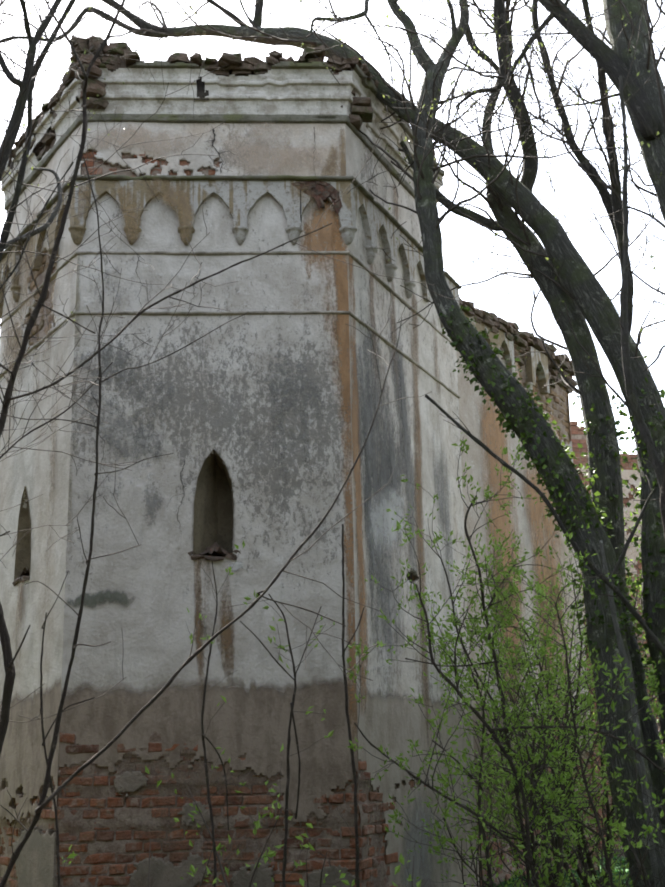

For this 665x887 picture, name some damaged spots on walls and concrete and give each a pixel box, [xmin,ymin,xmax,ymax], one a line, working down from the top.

spalling [81,150,220,177]
spalling [291,129,346,214]
rust [303,200,368,732]
leakage [357,329,415,659]
rust [412,295,429,729]
rust [195,559,209,674]
rust [220,601,234,674]
spalling [0,731,426,887]
leakage [0,679,479,887]